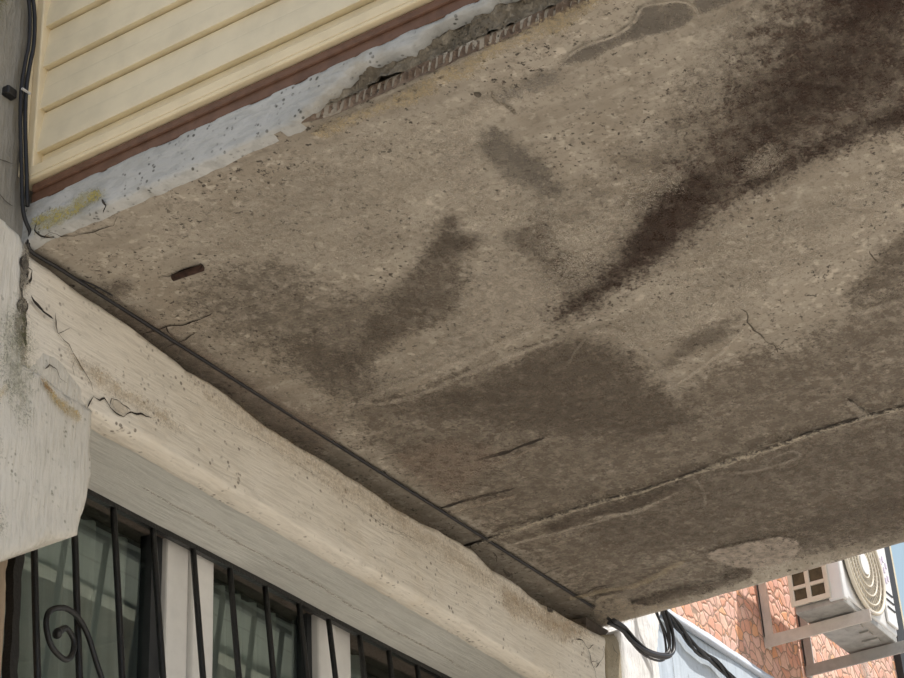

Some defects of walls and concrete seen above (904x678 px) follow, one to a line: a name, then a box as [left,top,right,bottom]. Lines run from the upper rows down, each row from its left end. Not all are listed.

spalling [301,0,590,123]
crack [15,199,152,418]
water stain [189,0,904,627]
crack [463,405,904,562]